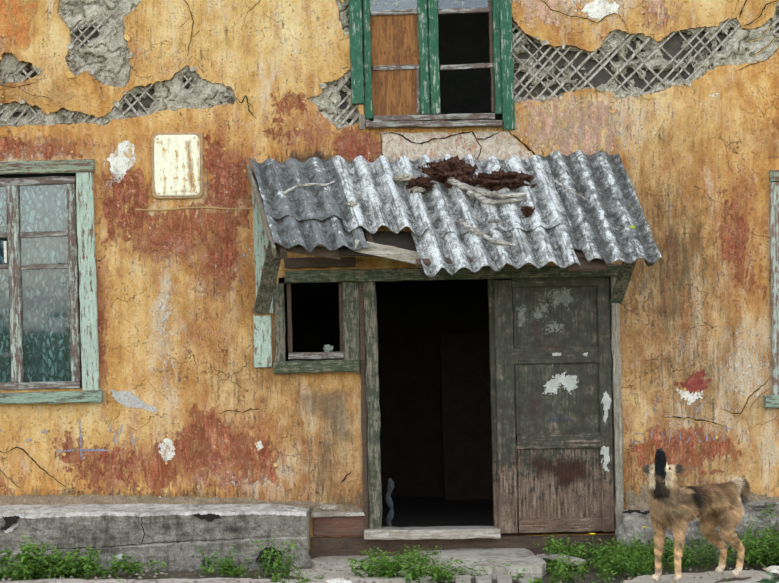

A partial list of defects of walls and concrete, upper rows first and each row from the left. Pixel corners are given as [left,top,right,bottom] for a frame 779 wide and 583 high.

crack [183,0,200,56]
spalling [0,0,237,160]
spalling [264,0,779,162]
crack [380,130,536,160]
peeling [95,130,253,280]
peeling [97,310,157,412]
peeling [675,369,711,406]
crack [662,378,771,428]
crack [0,446,70,491]
peeling [0,403,363,519]
spalling [1,516,20,534]